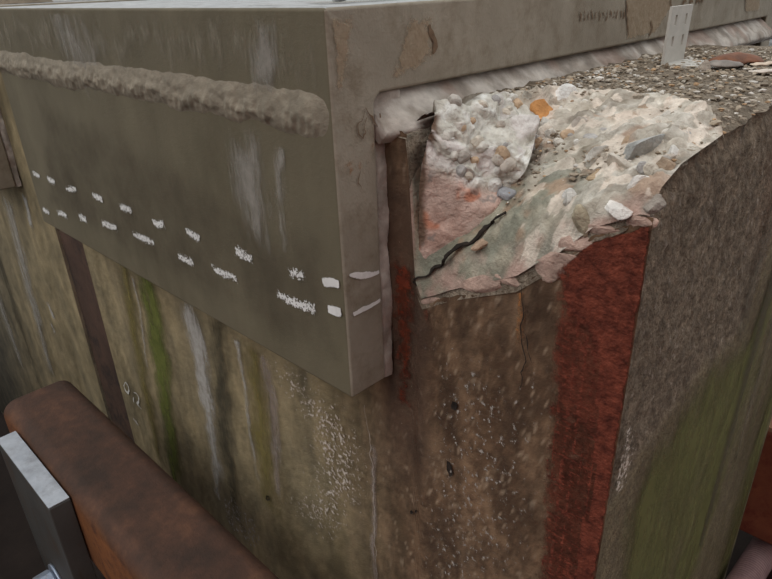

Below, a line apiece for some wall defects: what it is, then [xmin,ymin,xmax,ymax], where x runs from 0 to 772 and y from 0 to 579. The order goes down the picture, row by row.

crack [413,211,506,286]
spalling [410,83,724,304]
leakage [123,268,180,482]
leakage [185,307,236,509]
corrosion [541,226,651,579]